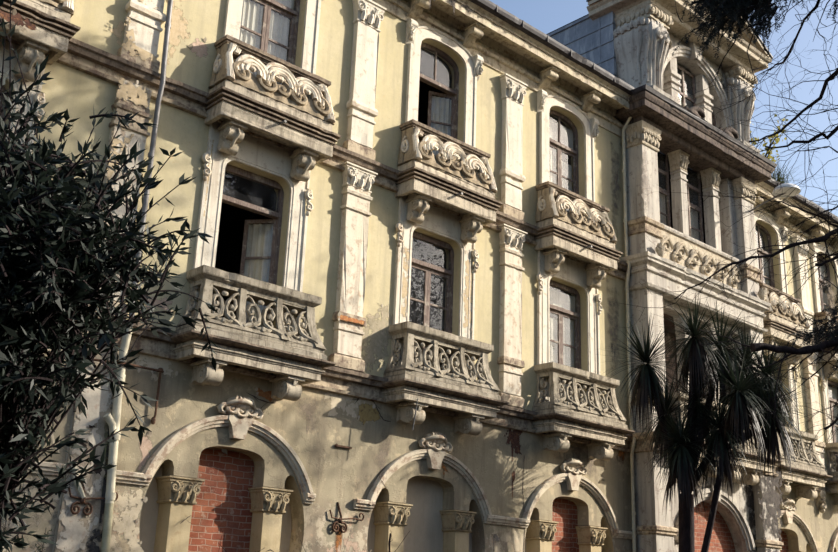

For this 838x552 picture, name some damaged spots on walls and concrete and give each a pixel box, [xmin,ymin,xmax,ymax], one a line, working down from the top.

peeling [110,0,208,65]
peeling [105,125,134,190]
peeling [2,362,114,552]
peeling [138,431,153,471]
peeling [112,485,148,552]